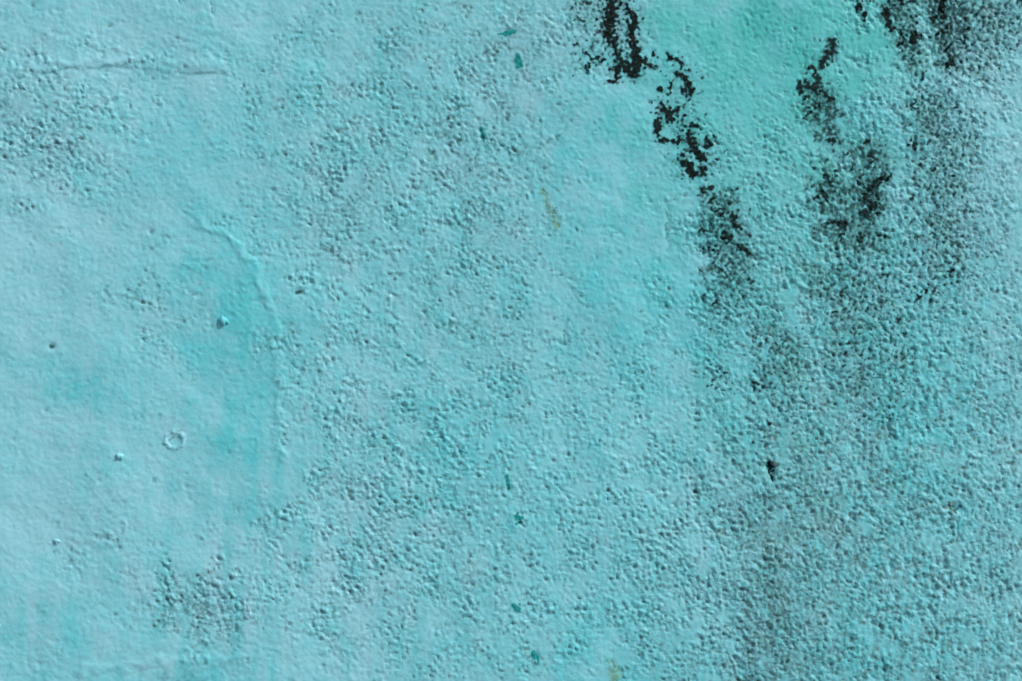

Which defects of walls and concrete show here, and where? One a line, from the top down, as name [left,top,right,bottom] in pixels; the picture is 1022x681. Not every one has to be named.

damp [571,0,760,320]
damp [752,310,813,448]
damp [796,0,1022,442]